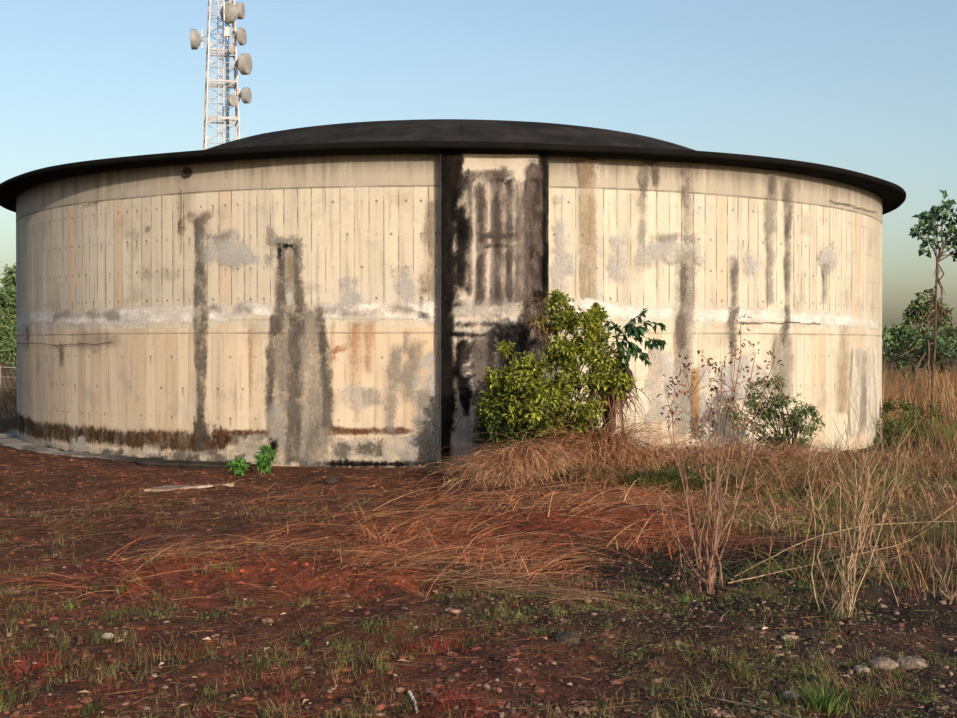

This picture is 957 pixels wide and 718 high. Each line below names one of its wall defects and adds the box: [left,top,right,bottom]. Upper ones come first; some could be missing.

water stain [16,151,600,469]
water stain [639,160,794,433]